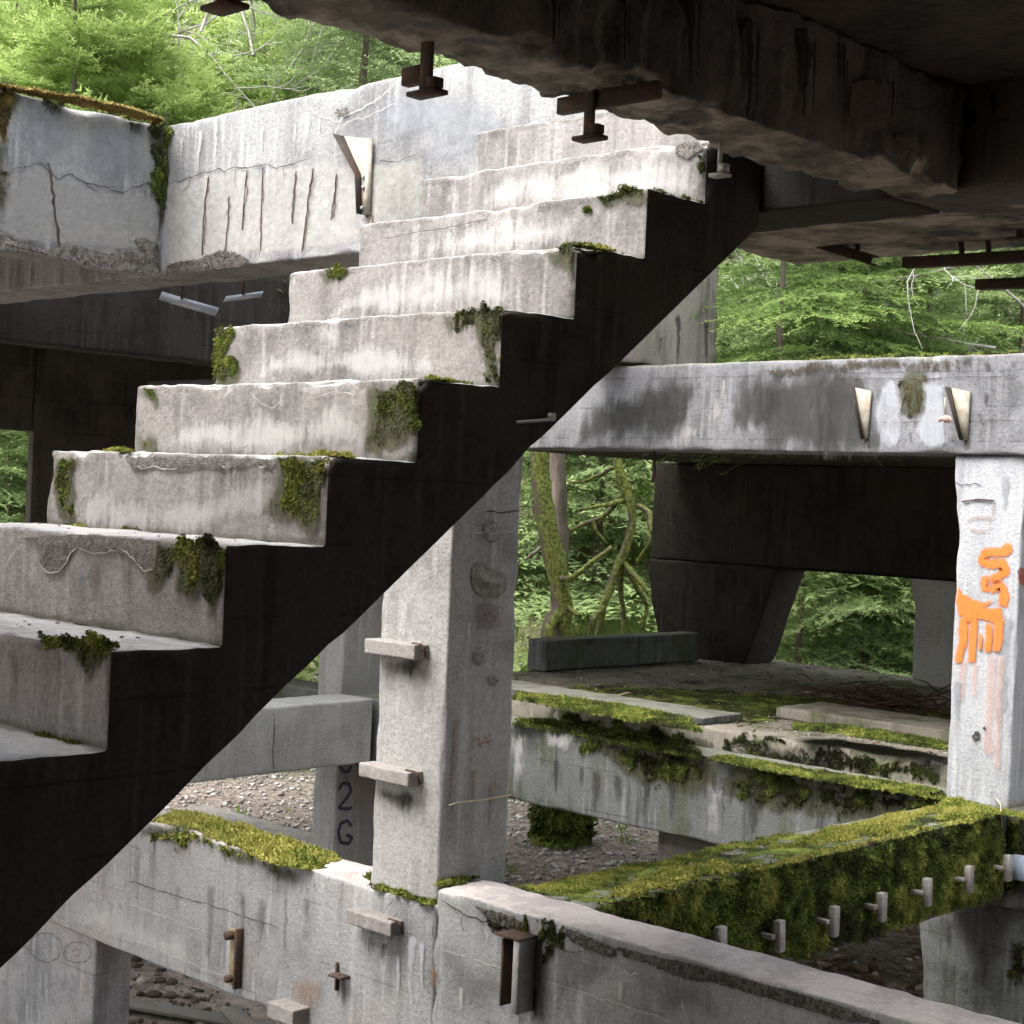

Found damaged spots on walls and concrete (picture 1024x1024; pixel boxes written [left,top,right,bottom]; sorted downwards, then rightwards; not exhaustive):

crack [15,158,308,193]
peeling [0,162,357,276]
damp [579,379,693,445]
damp [734,358,970,453]
spalling [7,534,157,573]
crack [98,881,288,947]
spalling [476,907,526,929]
spalling [560,928,880,1024]